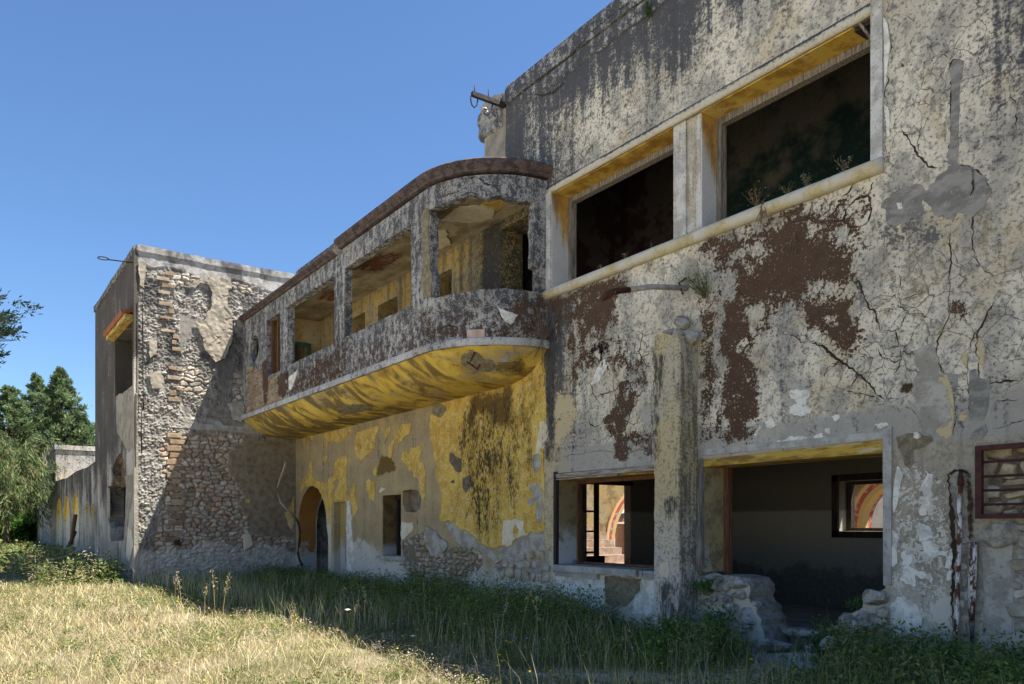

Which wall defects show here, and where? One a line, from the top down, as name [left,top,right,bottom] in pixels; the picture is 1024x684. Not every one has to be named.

flaking render [156,271,182,352]
crack [758,169,1023,432]
flaking render [165,433,187,546]
flaking render [168,366,185,402]
peeling [285,356,549,575]
damp [458,328,561,544]
peeling [900,473,953,588]
corrosion [966,476,974,540]